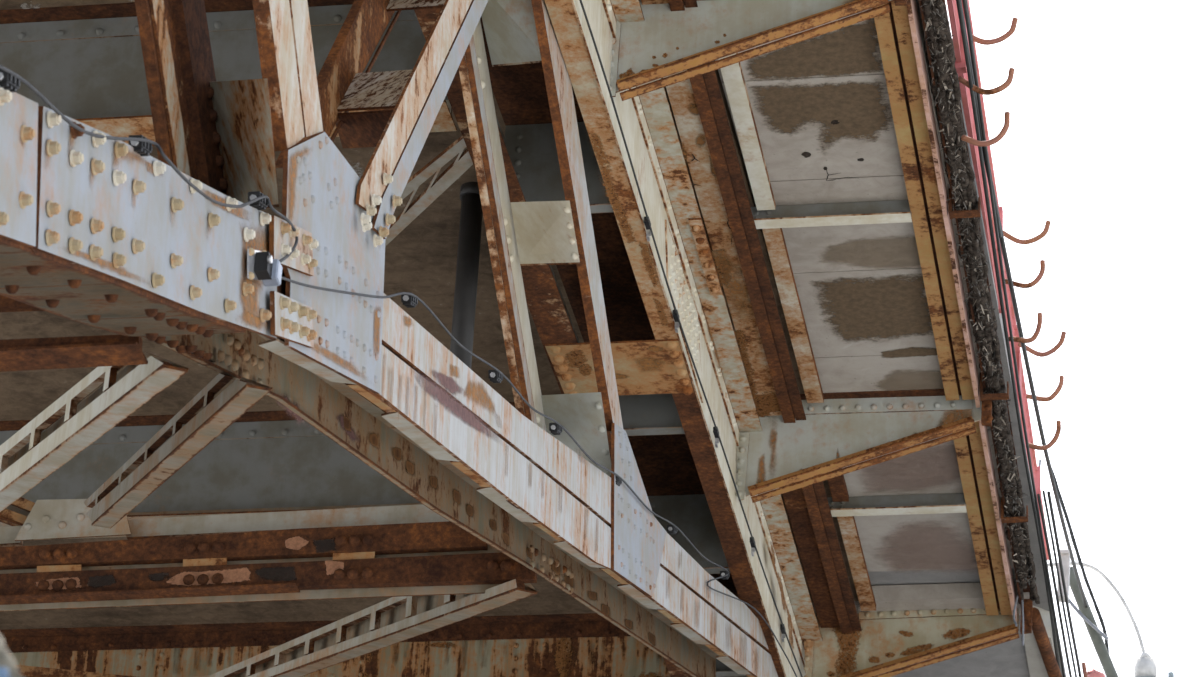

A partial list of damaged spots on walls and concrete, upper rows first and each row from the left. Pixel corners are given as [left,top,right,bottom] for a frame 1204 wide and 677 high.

rust [619,47,679,79]
water stain [748,18,893,150]
rust [589,133,669,326]
water stain [813,237,944,391]
rust [566,351,592,376]
peeling [285,536,344,575]
peeling [35,574,116,590]
peeling [148,566,297,586]
rust [827,627,970,677]